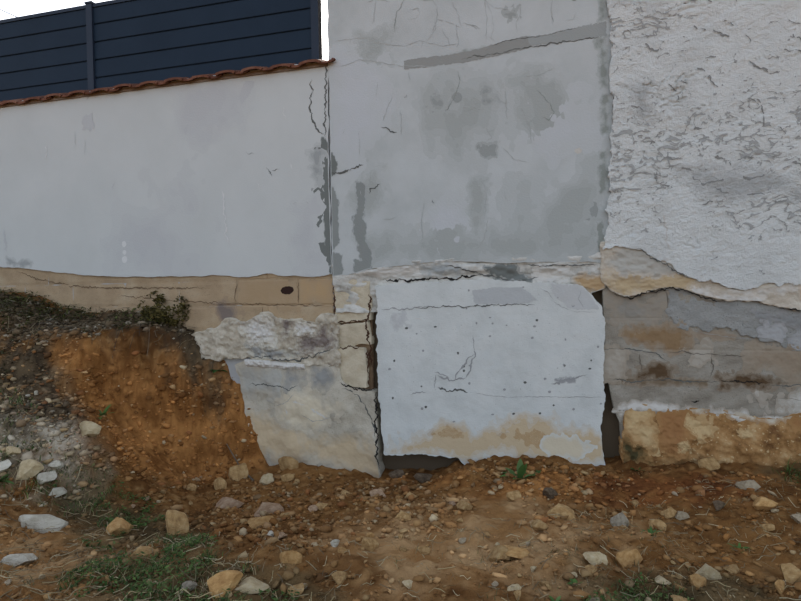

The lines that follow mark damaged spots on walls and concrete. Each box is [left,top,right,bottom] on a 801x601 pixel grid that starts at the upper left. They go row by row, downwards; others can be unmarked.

crack [308,0,597,142]
damp [213,19,612,403]
spalling [604,247,686,280]
crack [21,264,594,465]
spalling [597,344,631,385]
spalling [680,337,719,369]
crack [604,348,801,403]
damp [608,359,801,426]
spalling [624,404,660,456]
damp [622,435,663,466]
spalling [677,413,719,454]